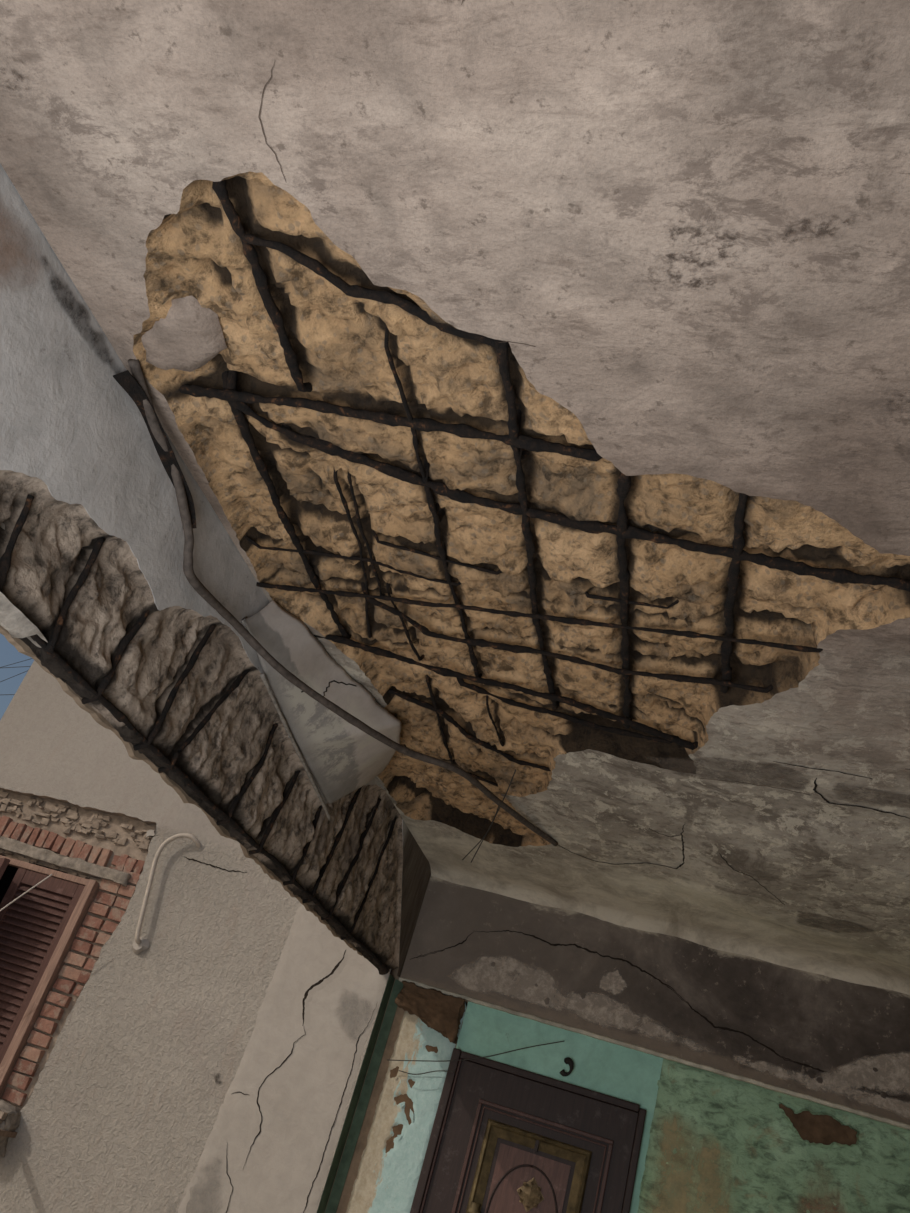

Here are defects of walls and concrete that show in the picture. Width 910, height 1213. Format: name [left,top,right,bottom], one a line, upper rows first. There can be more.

spalling [0,171,910,975]
crack [701,761,910,820]
flaking render [0,789,156,1108]
crack [226,950,349,1213]
crack [303,1005,377,1213]
peeling [385,1066,415,1153]
peeling [454,957,709,1052]
crack [410,923,910,1103]
peeling [776,1102,860,1148]
peeling [738,1052,910,1117]